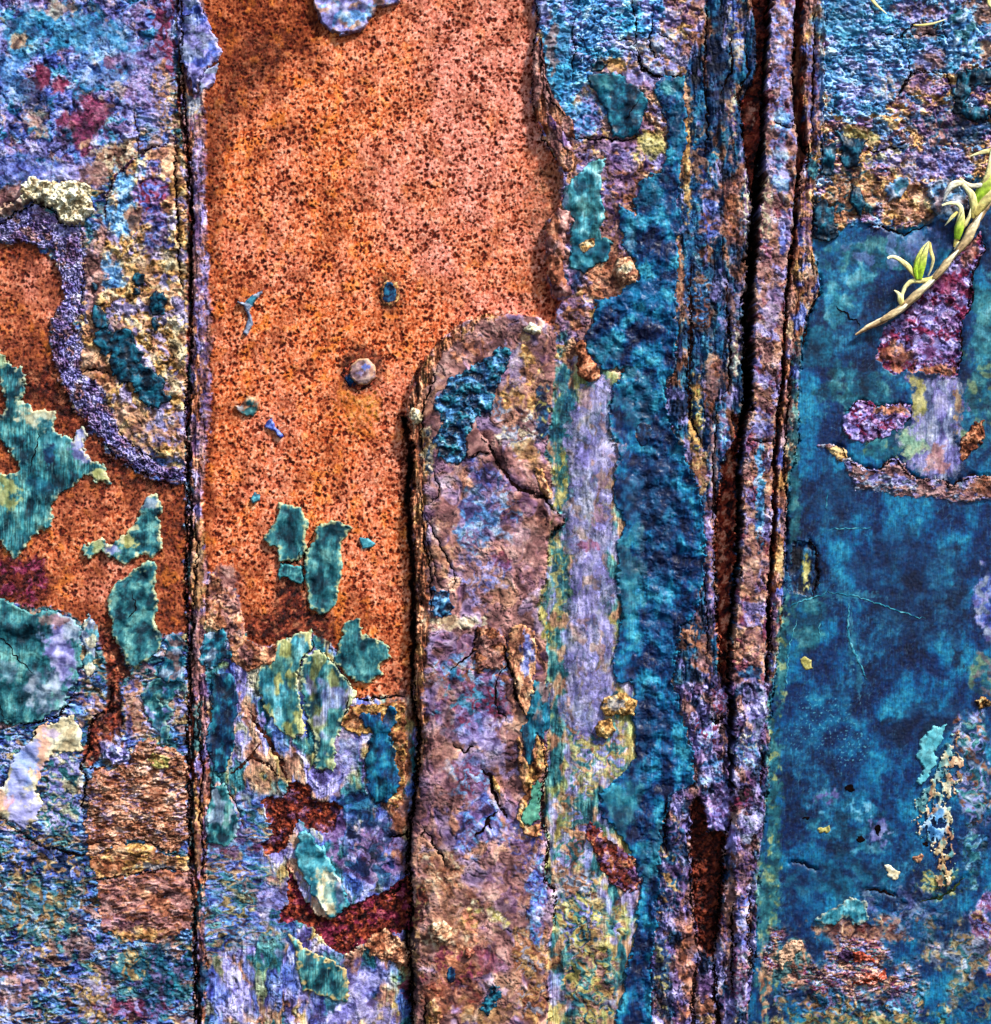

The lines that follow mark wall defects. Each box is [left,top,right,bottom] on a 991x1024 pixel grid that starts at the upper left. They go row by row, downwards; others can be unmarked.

rust [531,34,575,172]
peeling [0,349,112,560]
crack [0,0,288,1024]
peeling [263,502,376,615]
crack [418,363,456,620]
crack [469,436,566,538]
rust [204,573,336,672]
crack [451,630,477,670]
rust [473,624,538,715]
rust [260,781,343,855]
crack [278,531,446,1024]
rust [277,868,413,968]